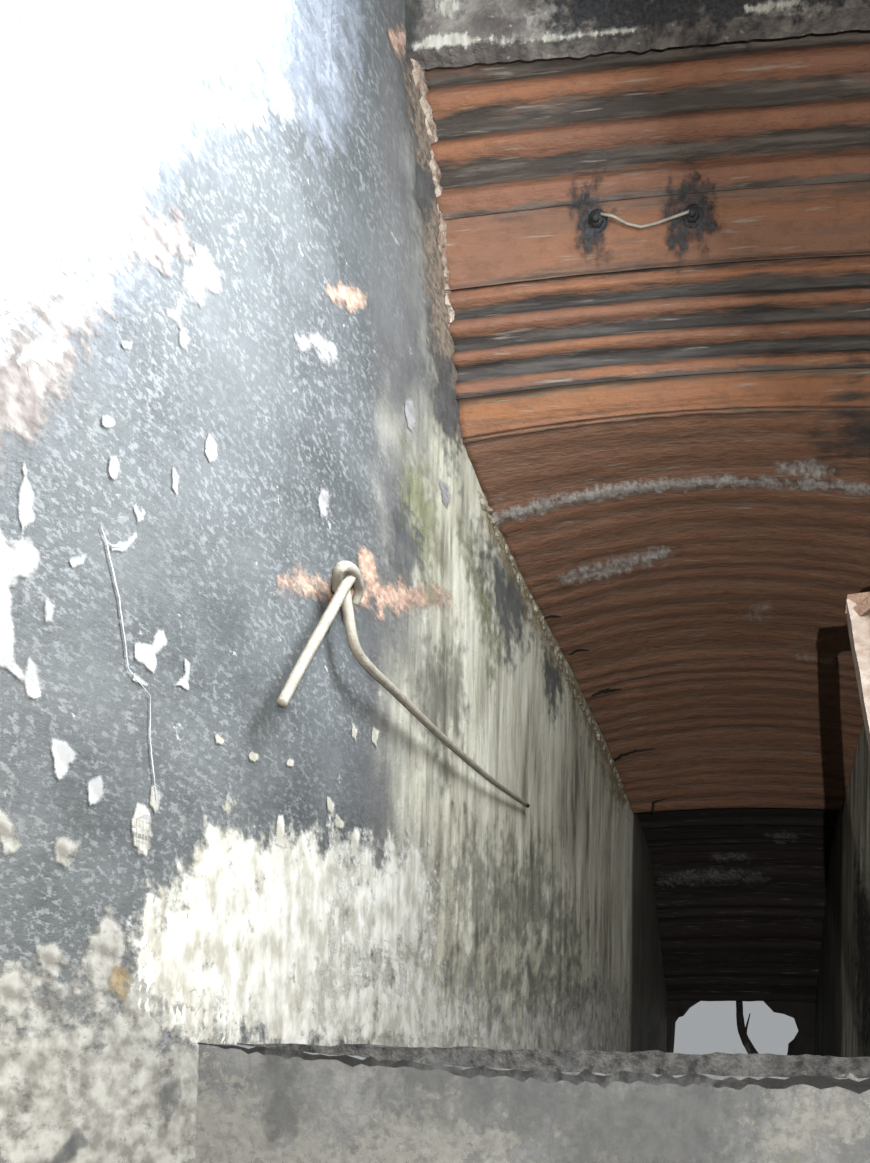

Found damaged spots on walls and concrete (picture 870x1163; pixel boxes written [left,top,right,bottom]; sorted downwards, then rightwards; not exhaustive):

leakage [793,0,845,23]
peeling [0,0,363,449]
leakage [664,172,717,255]
rust [327,282,366,312]
leakage [492,392,870,525]
peeling [0,465,41,698]
rust [278,570,334,600]
rust [350,548,450,619]
leakage [560,546,669,583]
peeling [133,630,167,686]
peeling [51,739,76,779]
peeling [128,797,630,1052]